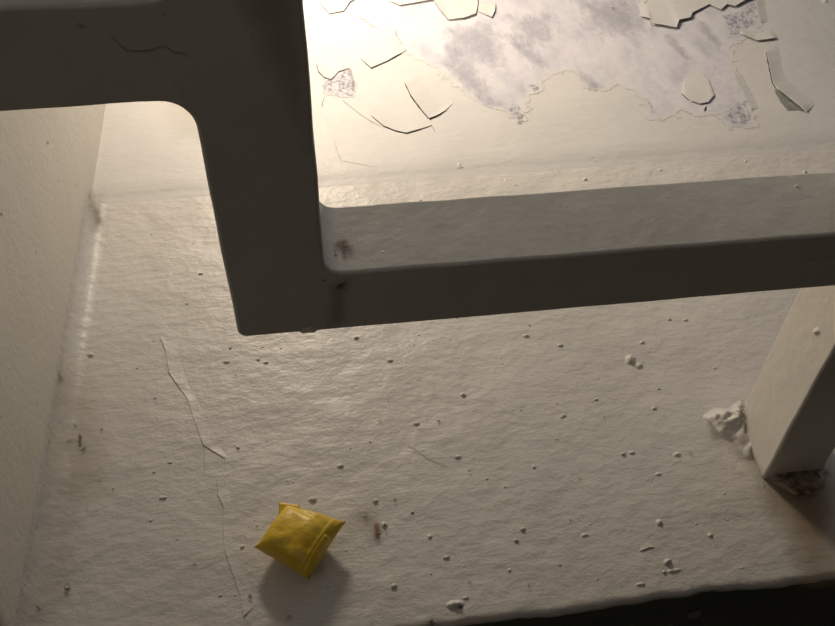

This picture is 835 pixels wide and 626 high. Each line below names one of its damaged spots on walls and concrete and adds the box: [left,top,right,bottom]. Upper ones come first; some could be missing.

spalling [315,54,357,98]
peeling [387,0,815,131]
spalling [766,467,828,499]